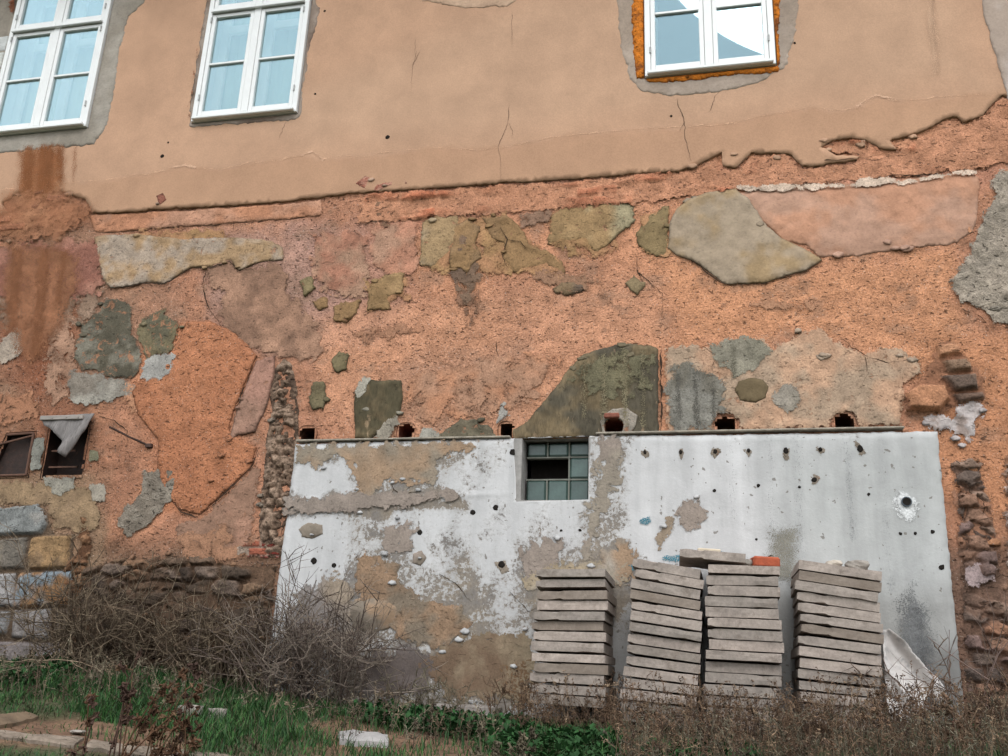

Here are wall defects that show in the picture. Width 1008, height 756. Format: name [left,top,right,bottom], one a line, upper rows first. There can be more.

flaking render [0,97,1008,558]
flaking render [0,479,101,661]
flaking render [282,351,562,707]
peeling [518,434,639,593]